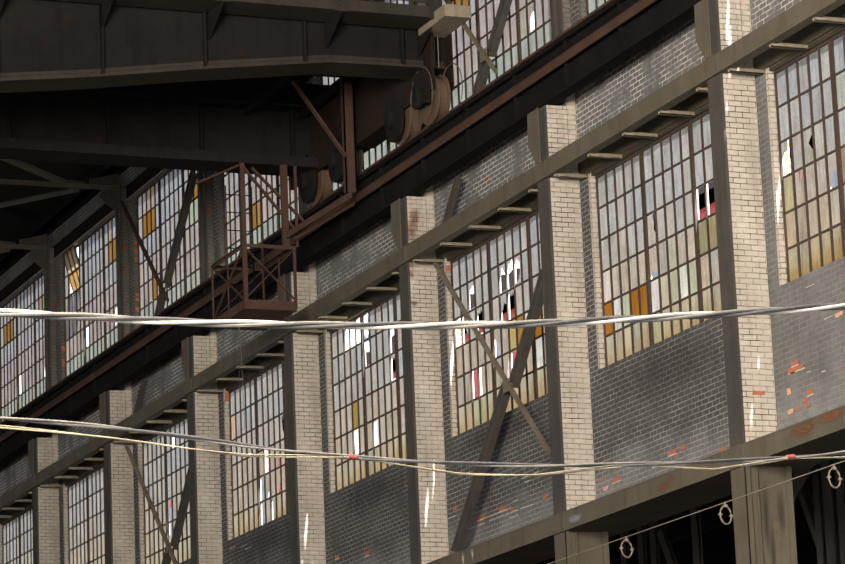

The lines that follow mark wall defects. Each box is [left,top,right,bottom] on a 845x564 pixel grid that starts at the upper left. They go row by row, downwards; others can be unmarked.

peeling [788,360,805,375]
peeling [788,389,814,415]